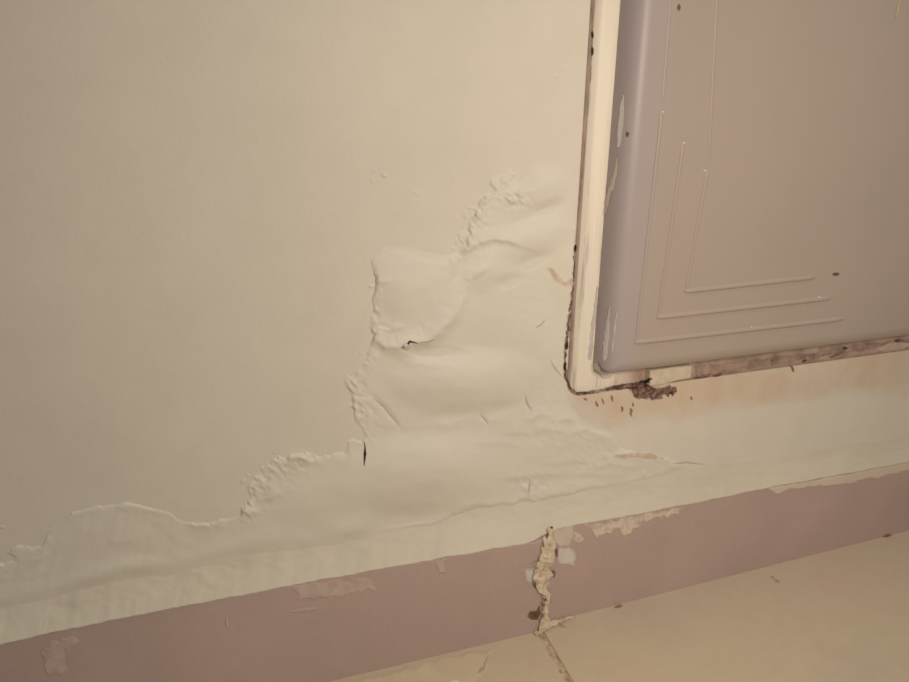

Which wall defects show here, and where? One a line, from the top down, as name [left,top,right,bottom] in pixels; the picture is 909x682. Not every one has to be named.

peeling [240,142,690,558]
peeling [767,462,909,495]
crack [532,527,558,634]